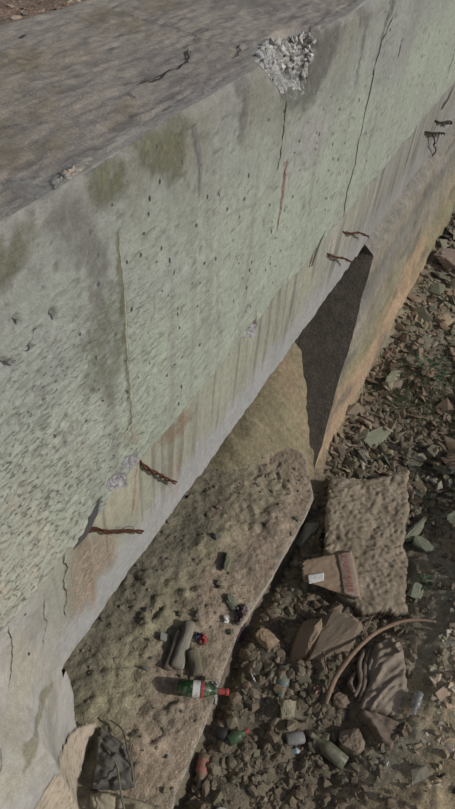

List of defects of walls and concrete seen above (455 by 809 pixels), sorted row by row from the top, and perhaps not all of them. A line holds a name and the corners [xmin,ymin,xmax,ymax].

crack [124,15,241,98]
crack [344,18,403,212]